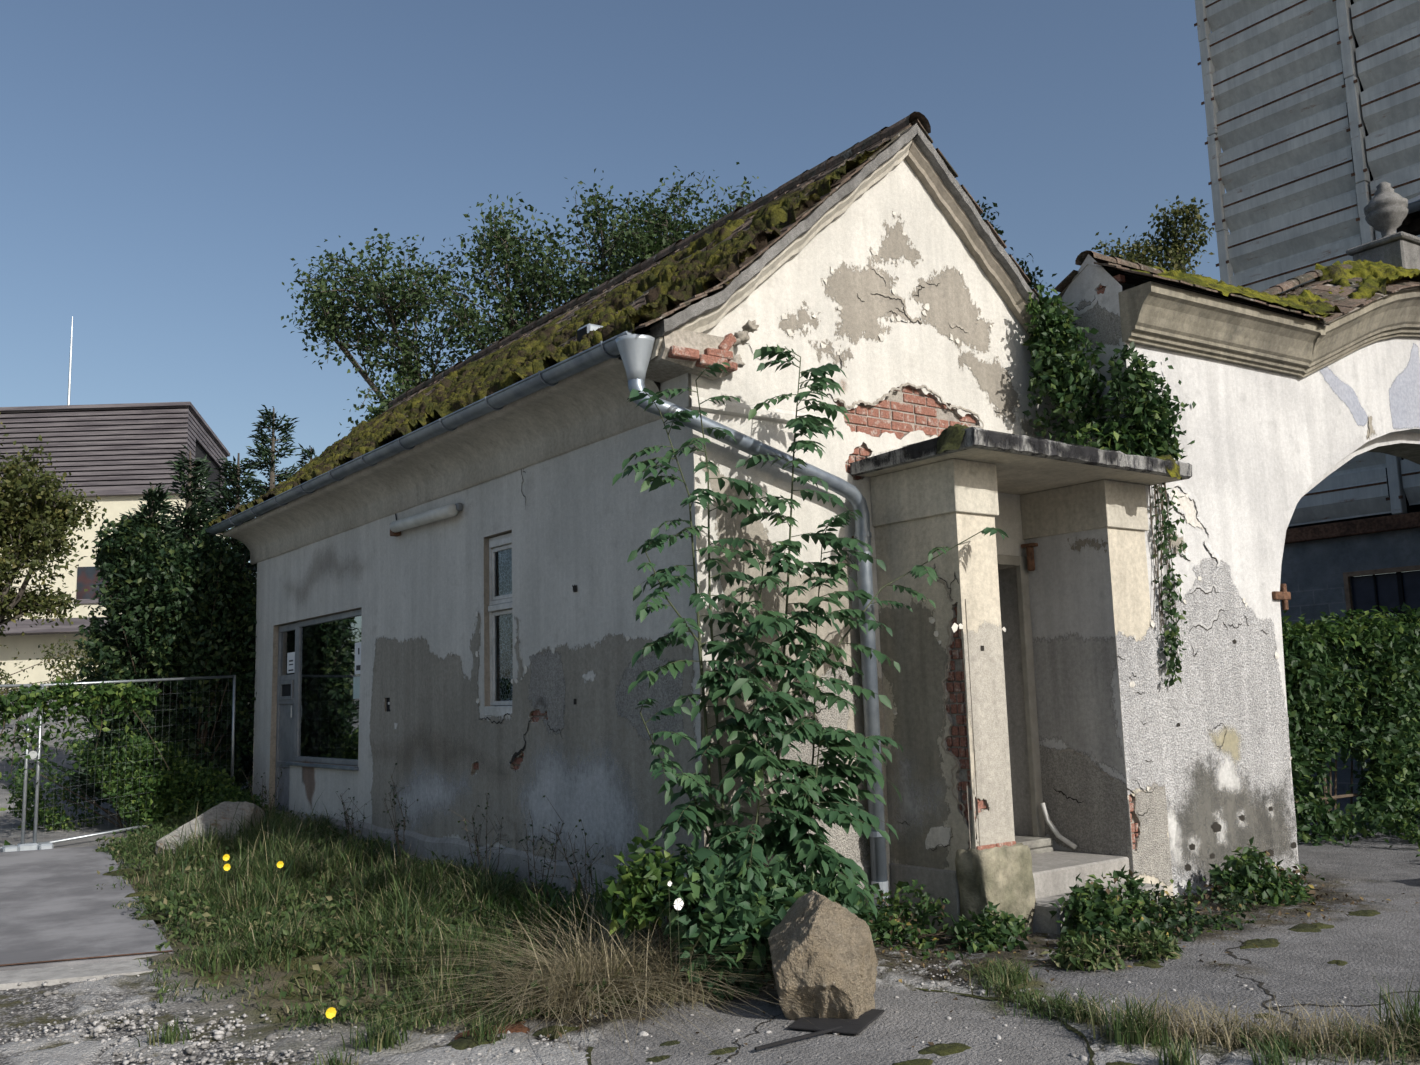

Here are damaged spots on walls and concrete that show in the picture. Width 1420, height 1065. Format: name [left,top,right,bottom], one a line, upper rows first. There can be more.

spalling [668,320,759,373]
flaking render [779,211,1047,480]
spalling [1366,416,1377,440]
peeling [369,455,1016,876]
spalling [1040,481,1298,886]
leakage [1167,730,1294,882]